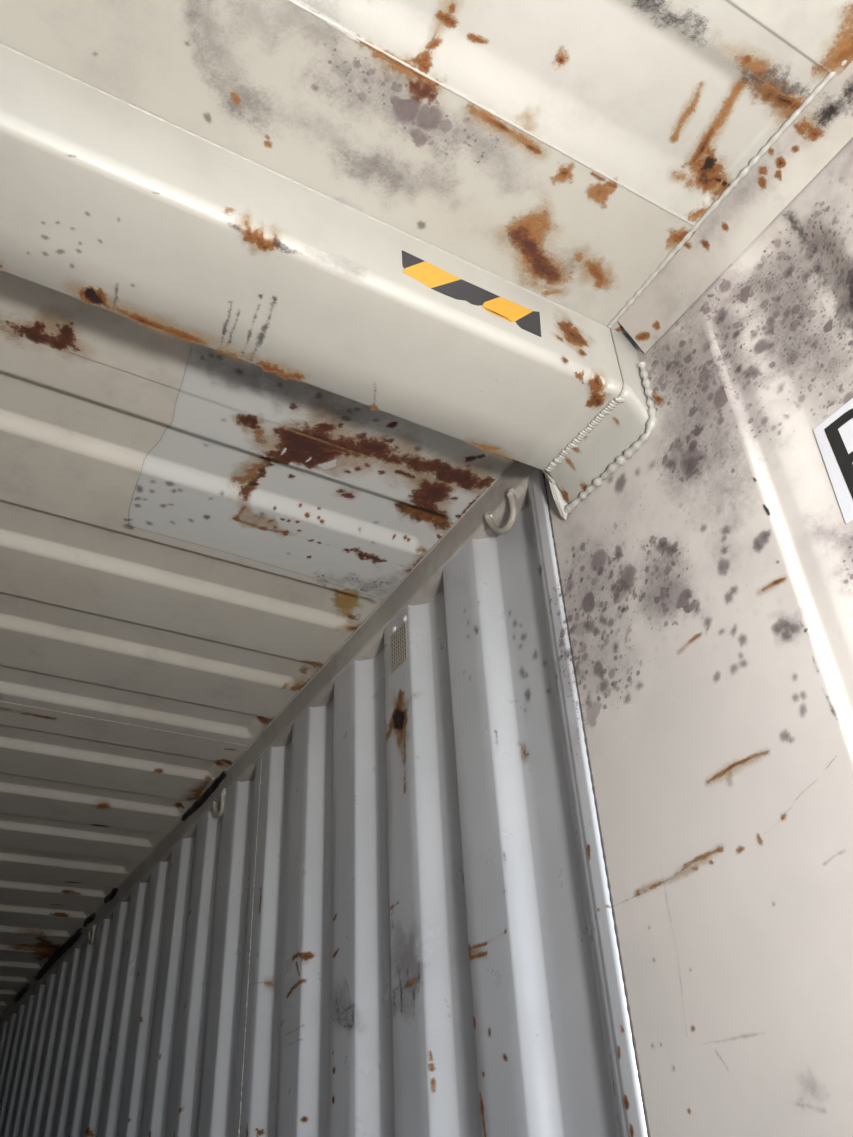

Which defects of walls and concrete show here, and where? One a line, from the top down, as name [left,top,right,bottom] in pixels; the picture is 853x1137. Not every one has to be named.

water stain [382,82,420,137]
rust [666,55,805,250]
rust [244,221,279,250]
rust [508,211,571,295]
rust [7,321,79,351]
rust [79,287,204,344]
rust [558,321,588,356]
rust [562,357,606,407]
water stain [650,201,853,482]
rust [231,414,499,544]
water stain [555,537,708,710]
rust [386,691,407,793]